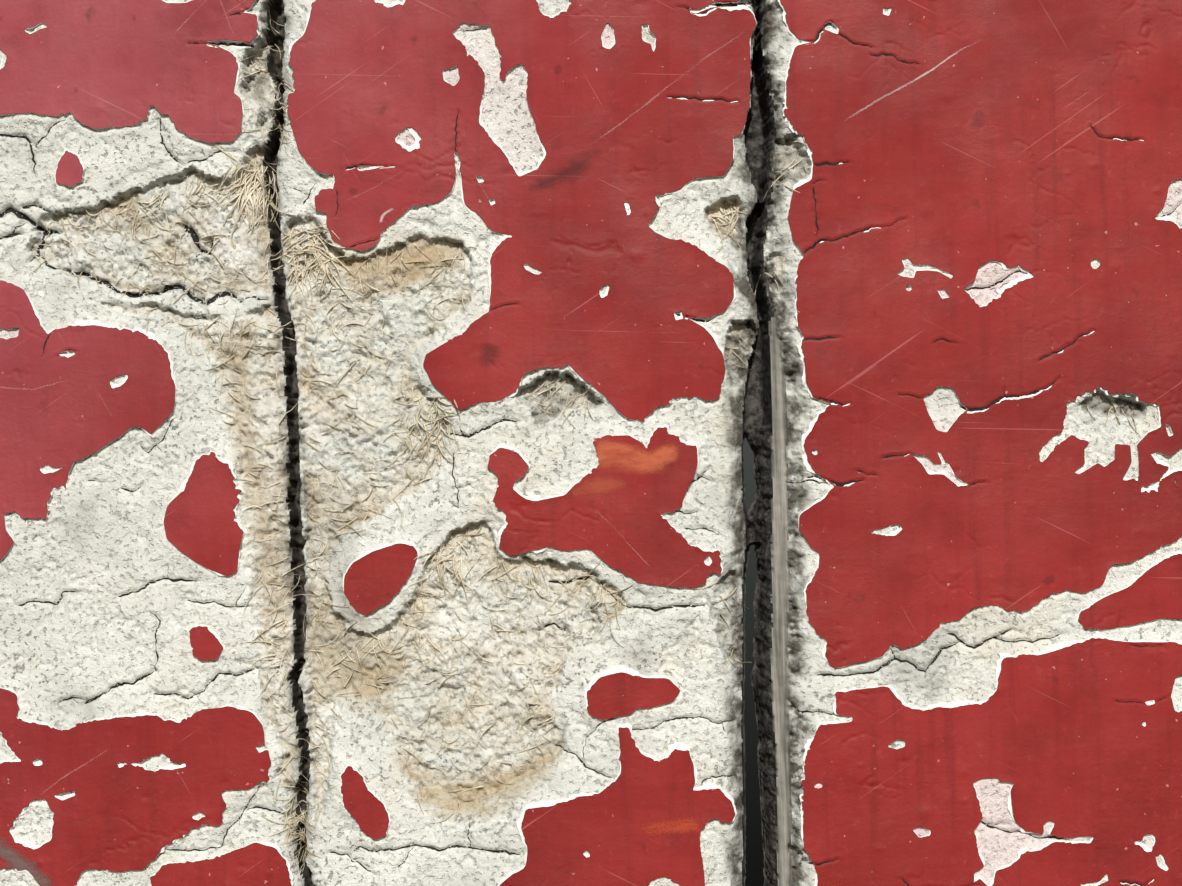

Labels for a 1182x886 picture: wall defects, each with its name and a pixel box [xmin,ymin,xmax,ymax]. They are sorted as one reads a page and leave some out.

crack [0,0,522,886]
peeling [0,0,761,886]
peeling [763,0,1182,886]